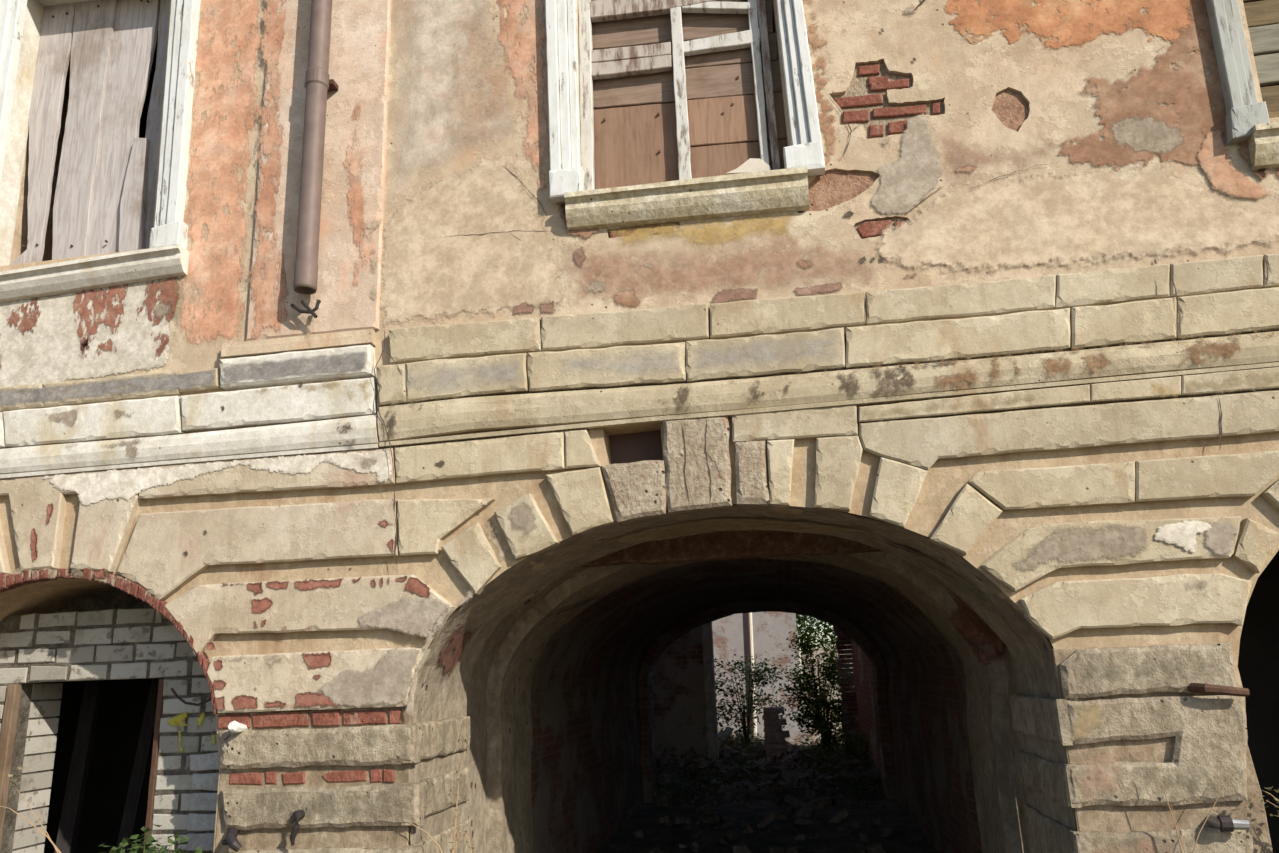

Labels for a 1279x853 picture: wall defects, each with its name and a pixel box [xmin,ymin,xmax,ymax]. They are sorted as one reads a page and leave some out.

flaking render [797,0,1279,277]
peeling [73,0,287,360]
flaking render [8,297,41,336]
leakage [839,360,951,396]
crack [682,424,721,506]
flaking render [0,439,430,729]
spalling [944,584,1004,665]
flaking render [229,771,305,785]
flaking render [322,769,394,783]